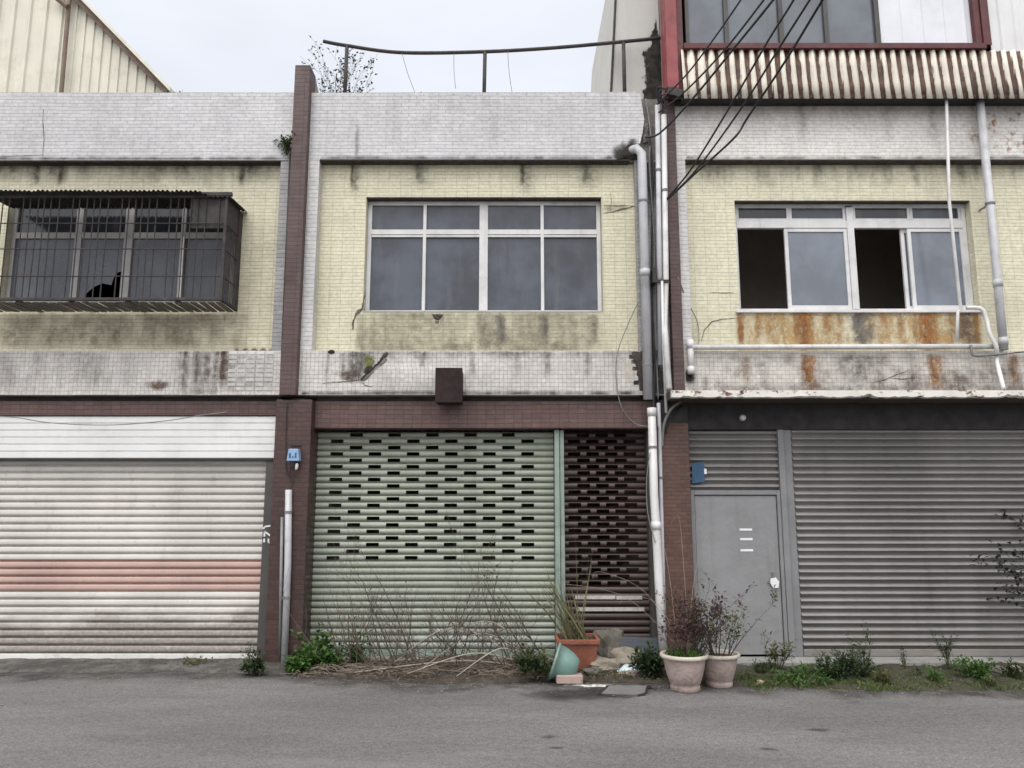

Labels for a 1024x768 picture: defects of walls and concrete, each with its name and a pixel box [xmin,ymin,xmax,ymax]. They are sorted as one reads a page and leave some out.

crack [352,292,366,329]
leakage [444,317,576,366]
corrosion [738,313,841,382]
corrosion [864,313,981,384]